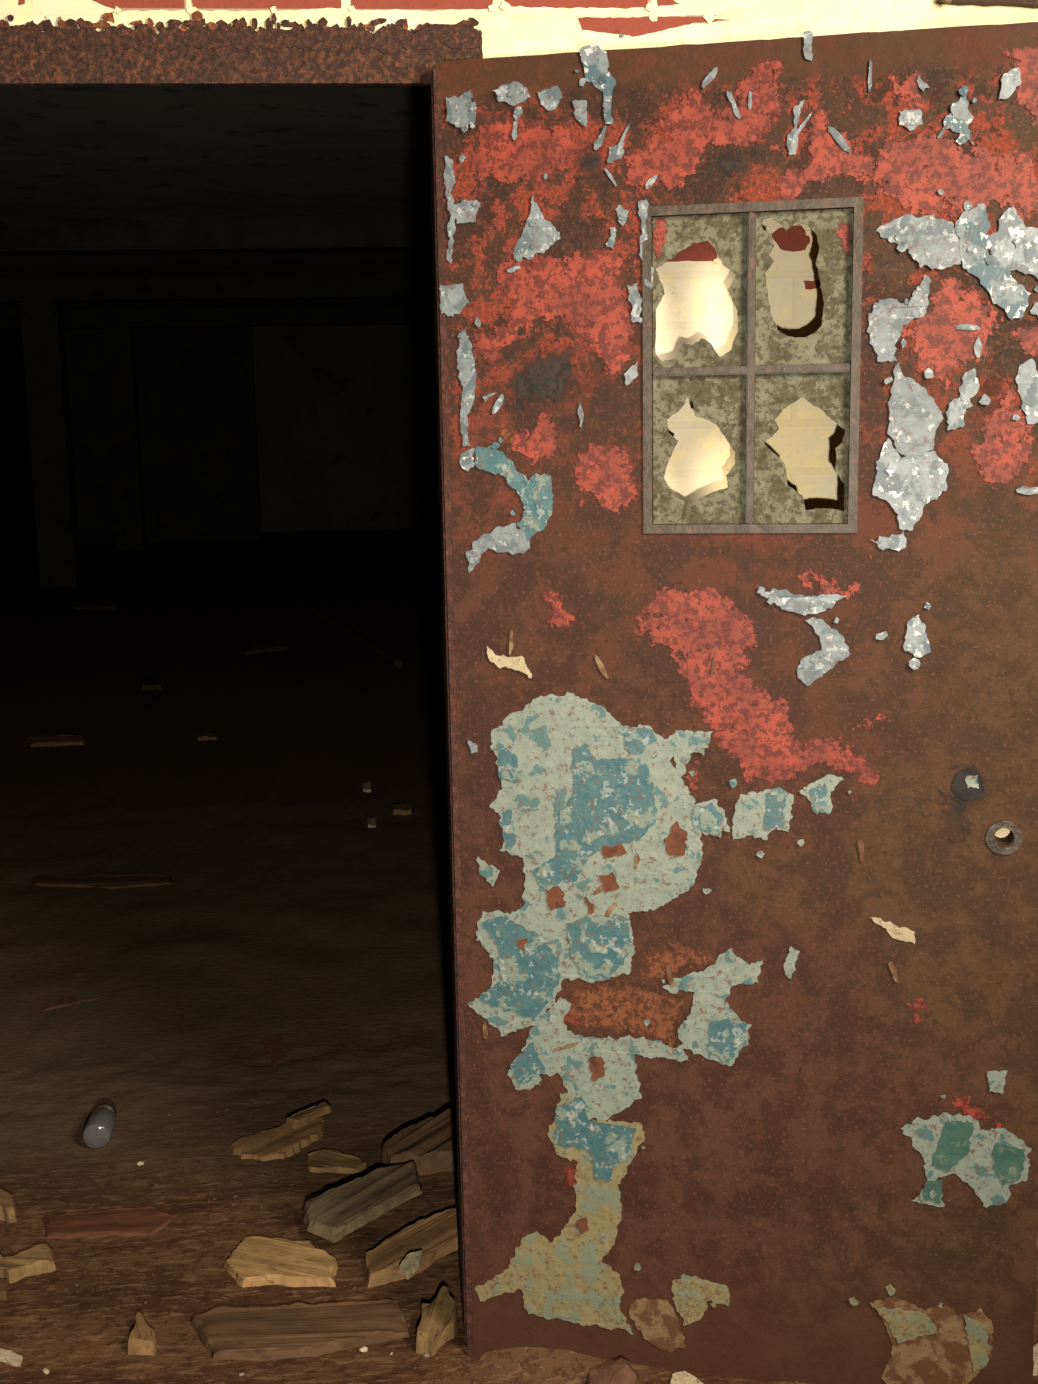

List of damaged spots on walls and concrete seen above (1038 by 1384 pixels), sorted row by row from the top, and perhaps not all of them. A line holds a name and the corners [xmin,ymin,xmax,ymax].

rust [0,10,430,34]
peeling [93,0,728,186]
peeling [937,86,977,145]
peeling [507,195,561,273]
peeling [606,175,722,323]
peeling [439,283,554,573]
peeling [867,200,1038,551]
peeling [757,586,850,686]
rust [566,938,715,1048]
peeling [468,692,852,1353]
peeling [900,1095,1032,1208]
peeling [849,1284,994,1384]